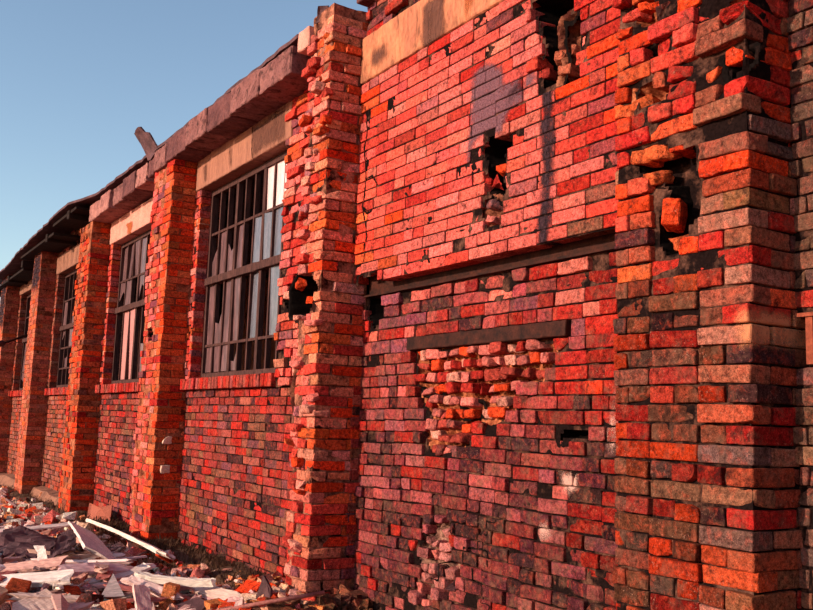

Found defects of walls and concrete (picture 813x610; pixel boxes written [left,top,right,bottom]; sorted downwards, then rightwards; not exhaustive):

spalling [622,0,659,31]
spalling [301,56,333,102]
spalling [533,0,583,89]
spalling [631,81,669,111]
spalling [645,43,659,58]
spalling [718,42,762,84]
crack [362,107,378,262]
spalling [479,133,513,228]
spalling [630,143,694,256]
spalling [283,272,323,326]
spalling [284,360,321,447]
spalling [560,429,589,441]